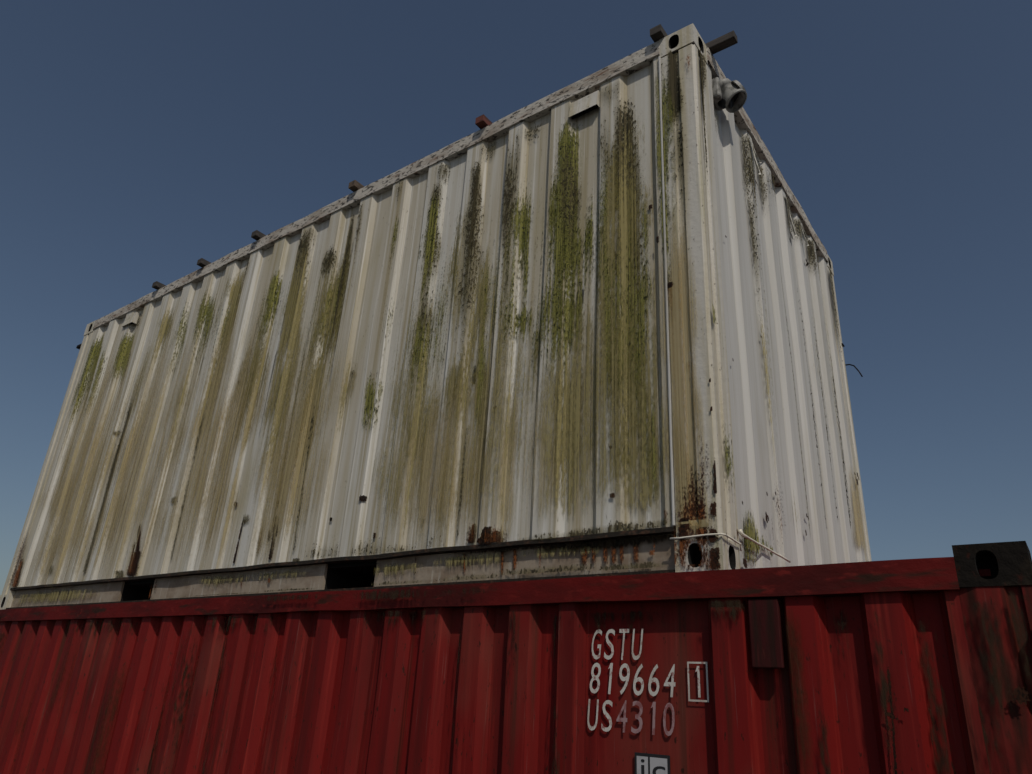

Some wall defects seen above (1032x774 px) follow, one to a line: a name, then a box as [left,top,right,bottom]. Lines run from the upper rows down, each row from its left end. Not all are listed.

water stain [38,204,363,575]
water stain [376,51,686,536]
rust [436,237,721,581]
water stain [19,589,92,603]